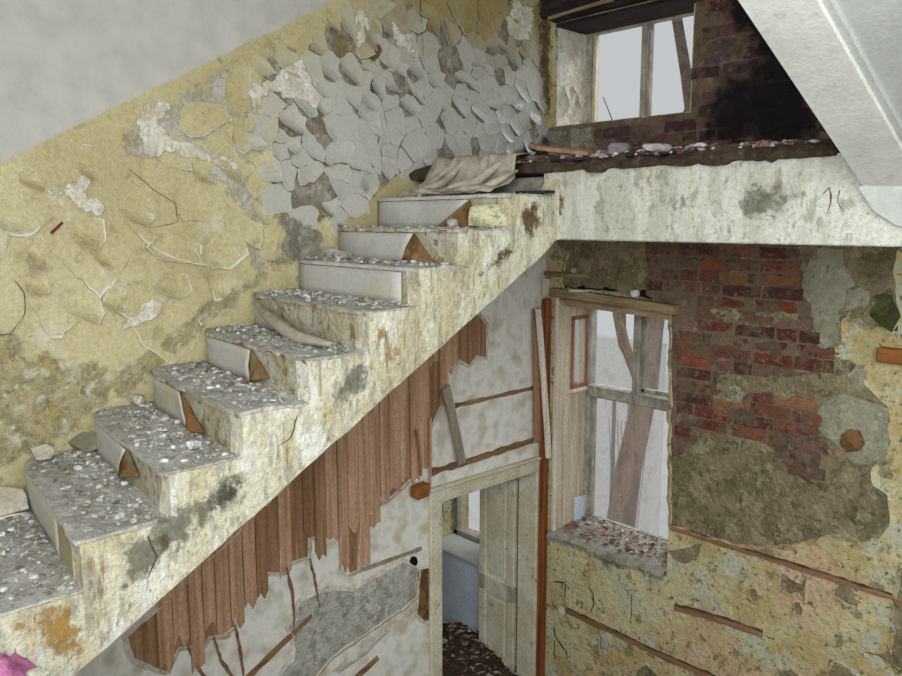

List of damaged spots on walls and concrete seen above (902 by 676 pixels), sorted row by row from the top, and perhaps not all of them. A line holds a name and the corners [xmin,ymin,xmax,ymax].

flaking render [801,99,830,140]
crack [129,169,207,228]
peeling [0,0,765,466]
crack [0,280,26,336]
flaking render [555,240,902,563]
water stain [122,474,242,589]
flaking render [123,312,489,676]
flaking render [631,662,660,676]
flaking render [777,569,810,619]
flaking render [886,554,902,676]